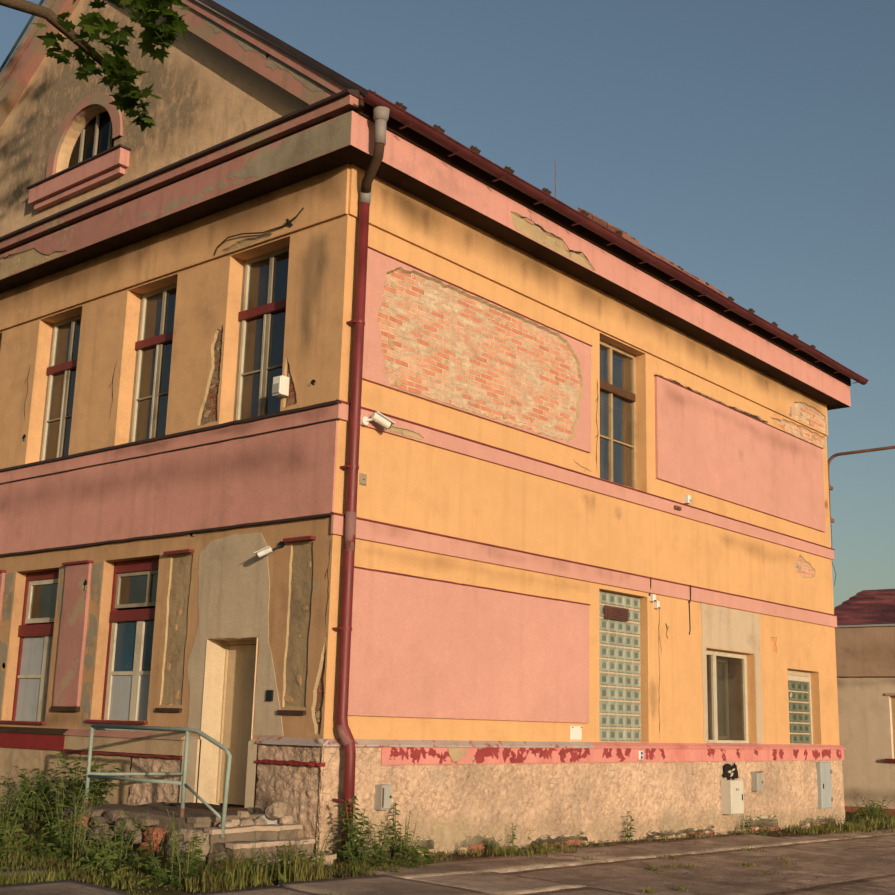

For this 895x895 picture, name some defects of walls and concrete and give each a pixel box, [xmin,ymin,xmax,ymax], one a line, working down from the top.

water stain [4,28,199,206]
spalling [0,247,67,279]
spalling [511,211,596,271]
spalling [198,325,223,426]
spalling [377,267,583,442]
spalling [656,374,827,449]
spalling [159,554,193,706]
spalling [282,541,327,736]
peeling [389,747,590,764]
peeling [603,748,631,762]
peeling [645,749,665,761]
peeling [772,749,842,760]